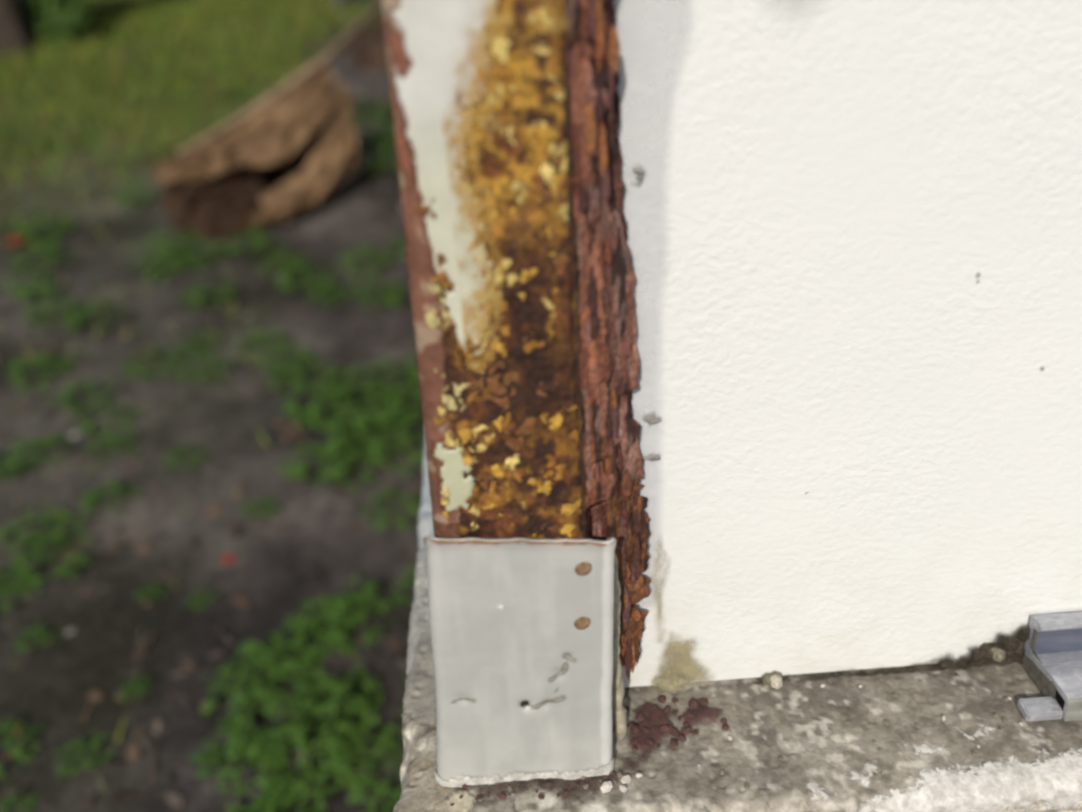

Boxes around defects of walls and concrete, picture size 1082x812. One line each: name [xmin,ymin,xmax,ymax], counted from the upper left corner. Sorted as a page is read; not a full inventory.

peeling [381,0,461,524]
corrosion [414,198,436,219]
corrosion [423,0,651,681]
peeling [401,632,614,812]
corrosion [626,703,721,770]